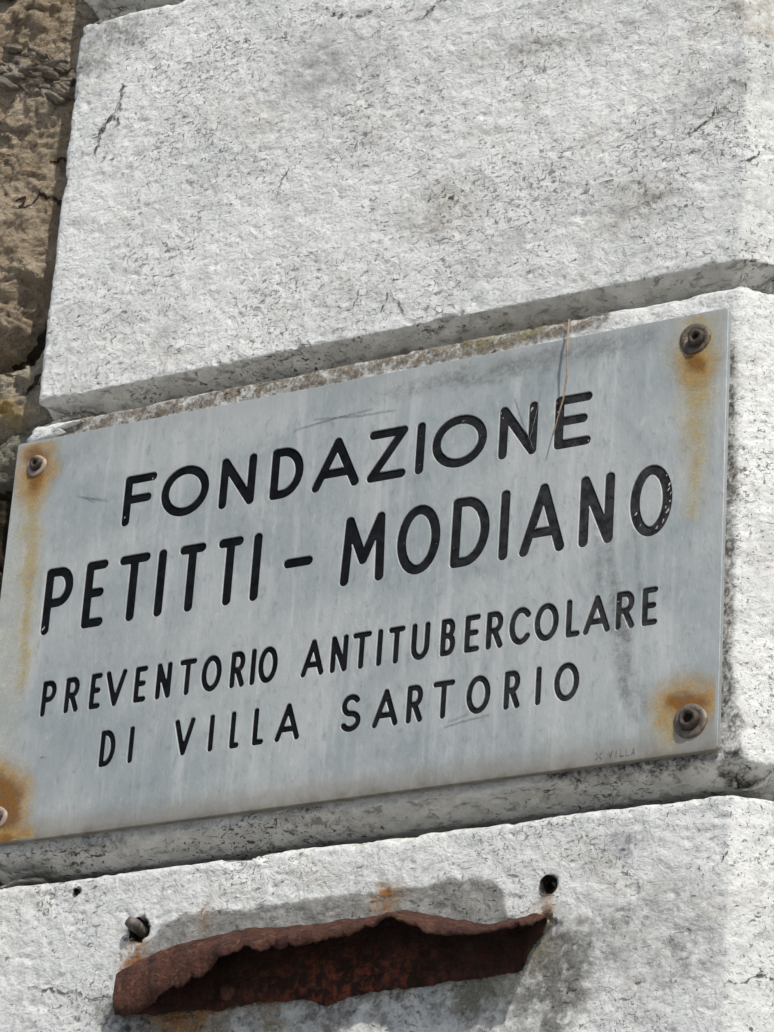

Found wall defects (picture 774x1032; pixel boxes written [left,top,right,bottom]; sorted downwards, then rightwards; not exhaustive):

corrosion [681,315,715,515]
corrosion [15,441,58,684]
corrosion [0,763,33,842]
corrosion [653,680,716,741]